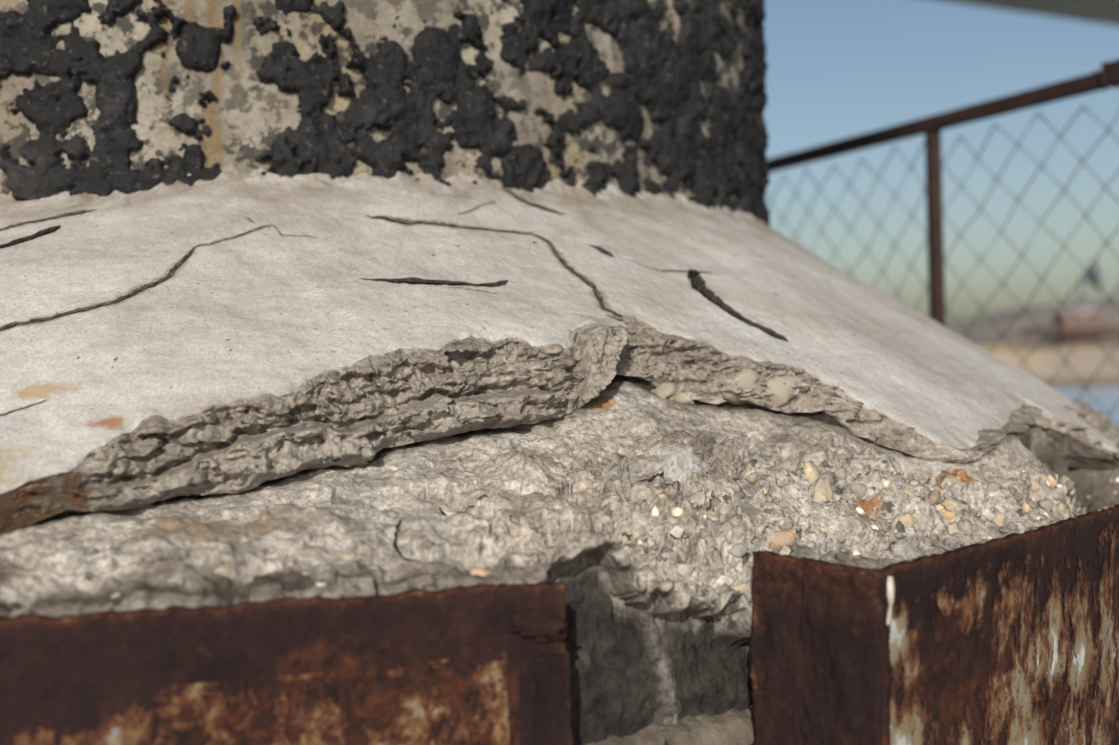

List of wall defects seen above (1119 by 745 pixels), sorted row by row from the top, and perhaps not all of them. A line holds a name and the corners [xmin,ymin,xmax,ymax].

peeling [203,111,220,168]
spalling [0,225,61,248]
crack [0,209,97,231]
crack [0,217,315,331]
crack [364,185,622,316]
spalling [4,336,585,523]
spalling [605,314,1119,608]
corrosion [0,471,89,534]
corrosion [858,499,882,520]
spalling [214,564,259,584]
spalling [470,567,492,577]
peeling [888,522,1119,745]